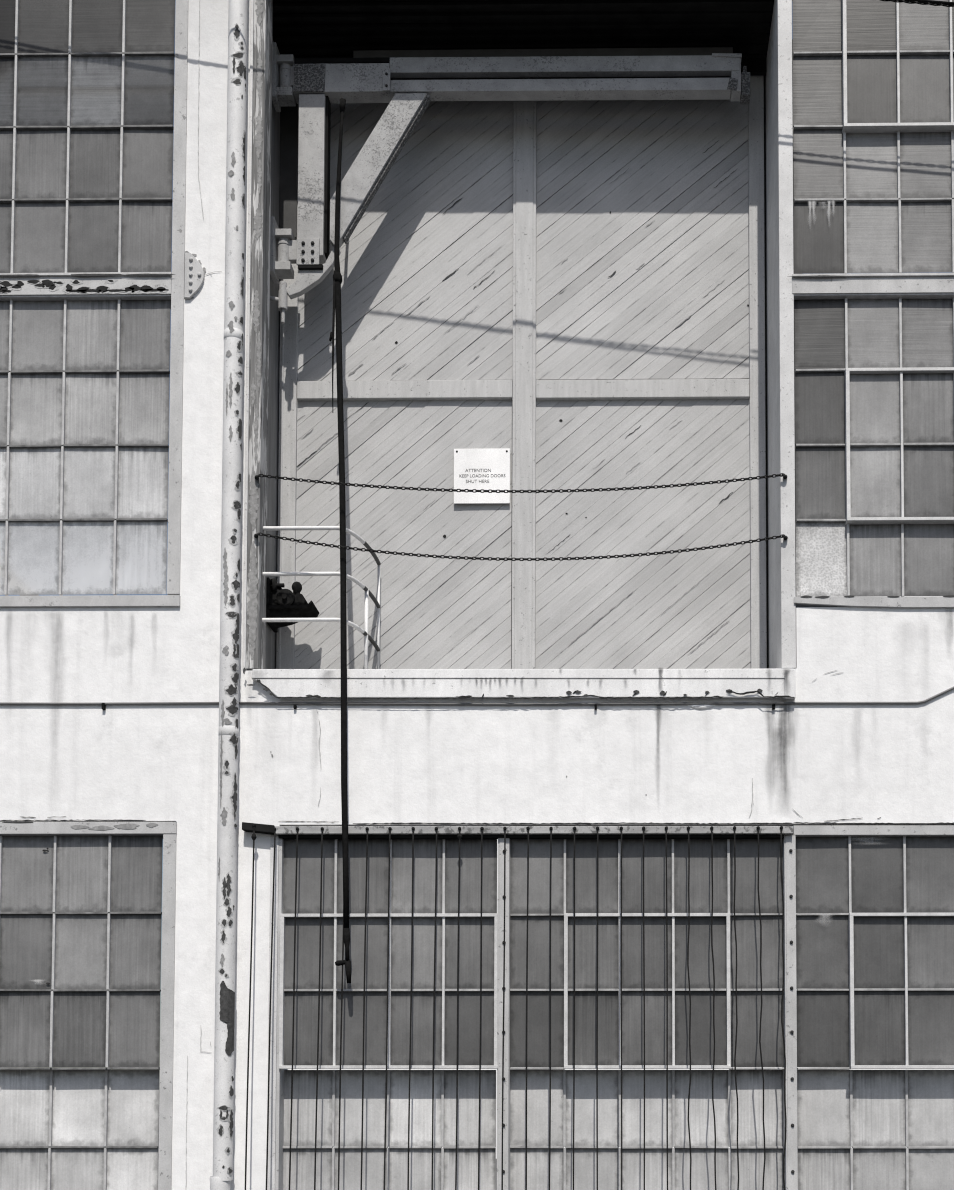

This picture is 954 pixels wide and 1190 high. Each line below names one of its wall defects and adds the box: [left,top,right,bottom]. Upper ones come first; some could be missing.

peeling [228,23,263,240]
peeling [0,273,175,294]
peeling [218,857,235,1056]